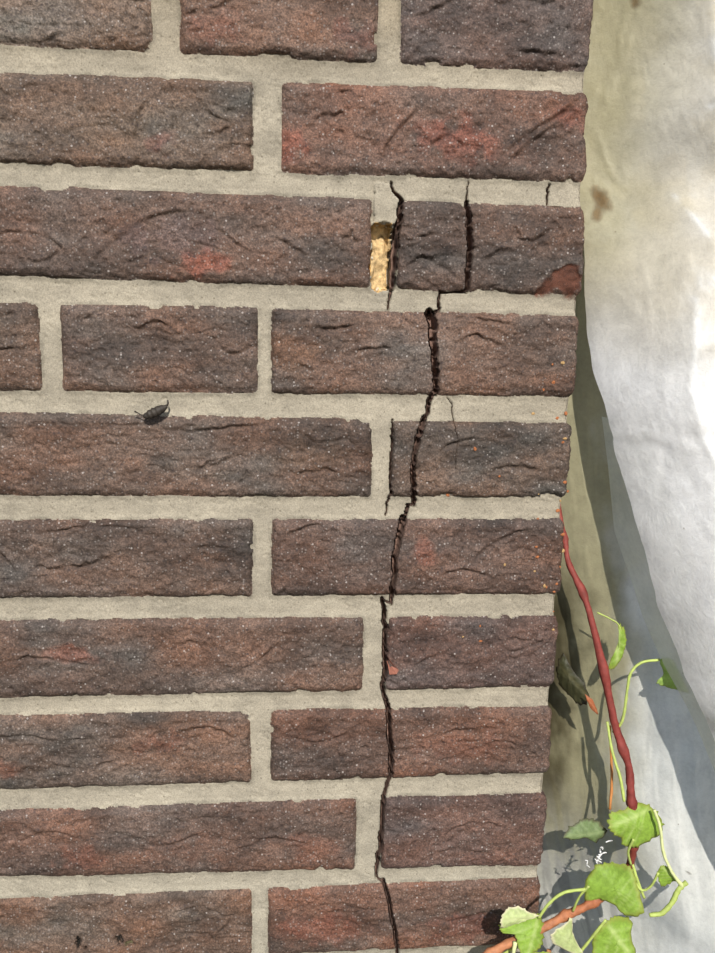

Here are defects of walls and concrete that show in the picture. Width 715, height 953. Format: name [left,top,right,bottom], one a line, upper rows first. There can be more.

crack [375,182,473,953]
spalling [535,264,581,298]